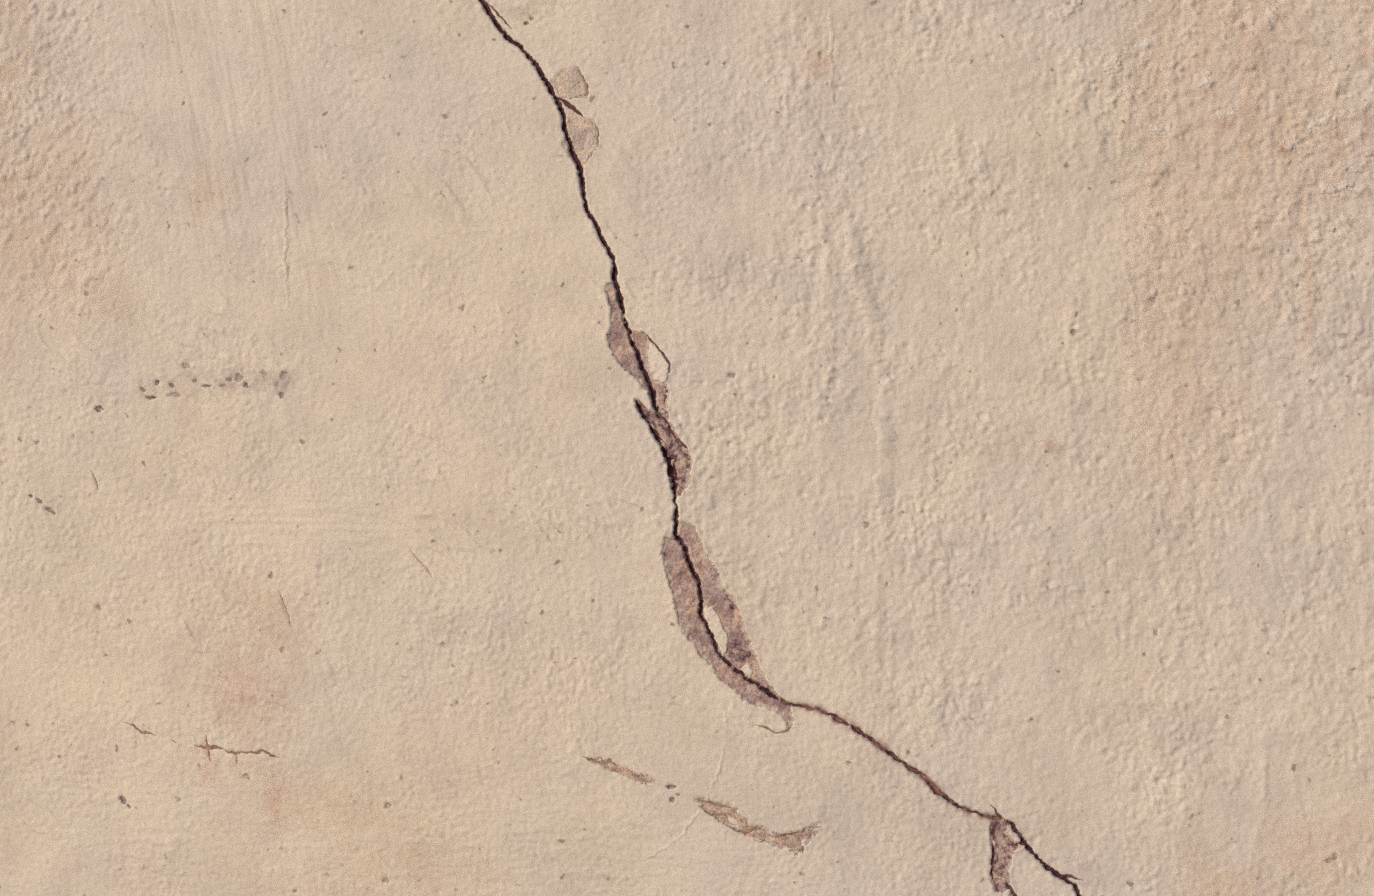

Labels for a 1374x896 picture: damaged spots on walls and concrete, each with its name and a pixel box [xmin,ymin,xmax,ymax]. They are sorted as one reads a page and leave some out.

peeling [550,66,599,166]
flaking render [606,282,692,495]
crack [479,0,1081,896]
flaking render [662,523,794,734]
peeling [582,756,823,856]